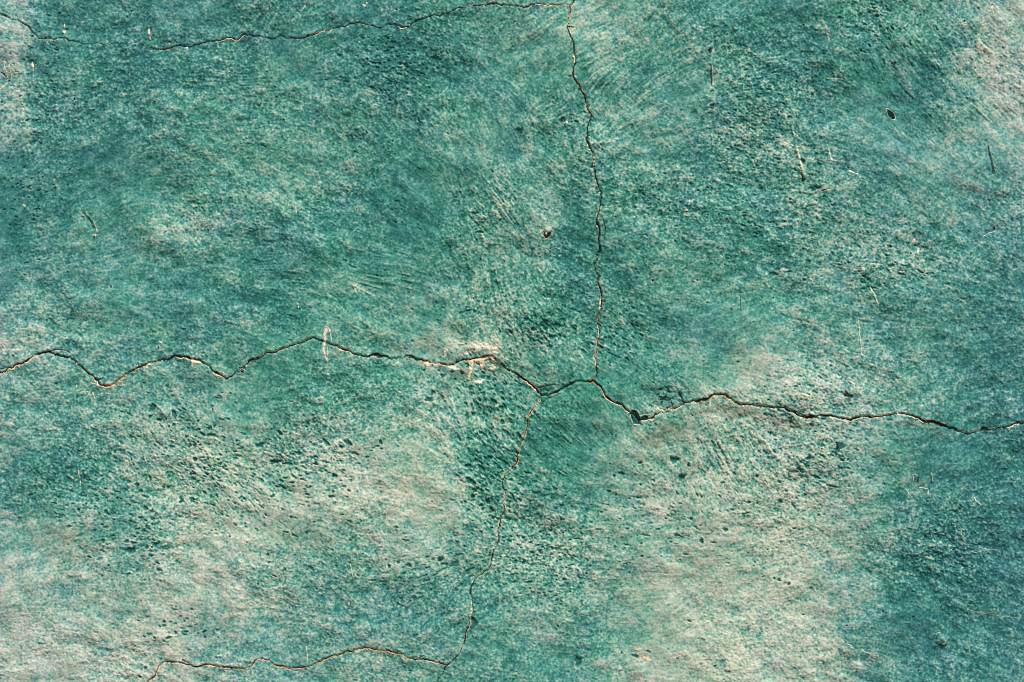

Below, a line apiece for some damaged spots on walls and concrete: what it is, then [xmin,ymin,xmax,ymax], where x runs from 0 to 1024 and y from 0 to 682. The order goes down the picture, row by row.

crack [0,0,641,682]
crack [650,392,1024,435]